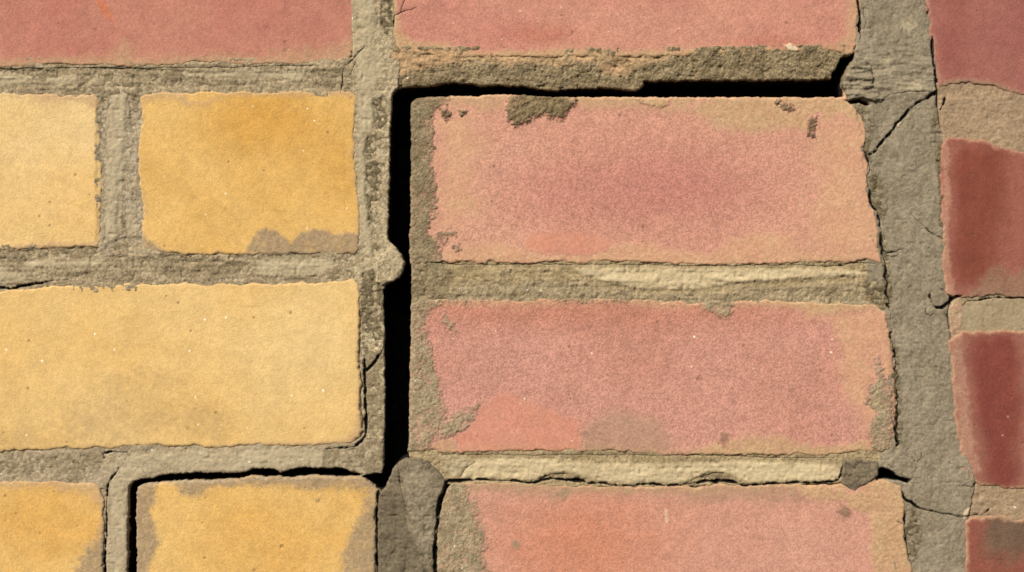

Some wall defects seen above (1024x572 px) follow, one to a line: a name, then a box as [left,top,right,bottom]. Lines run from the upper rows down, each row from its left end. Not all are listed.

spalling [0,63,351,282]
crack [102,0,868,572]
crack [833,0,946,559]